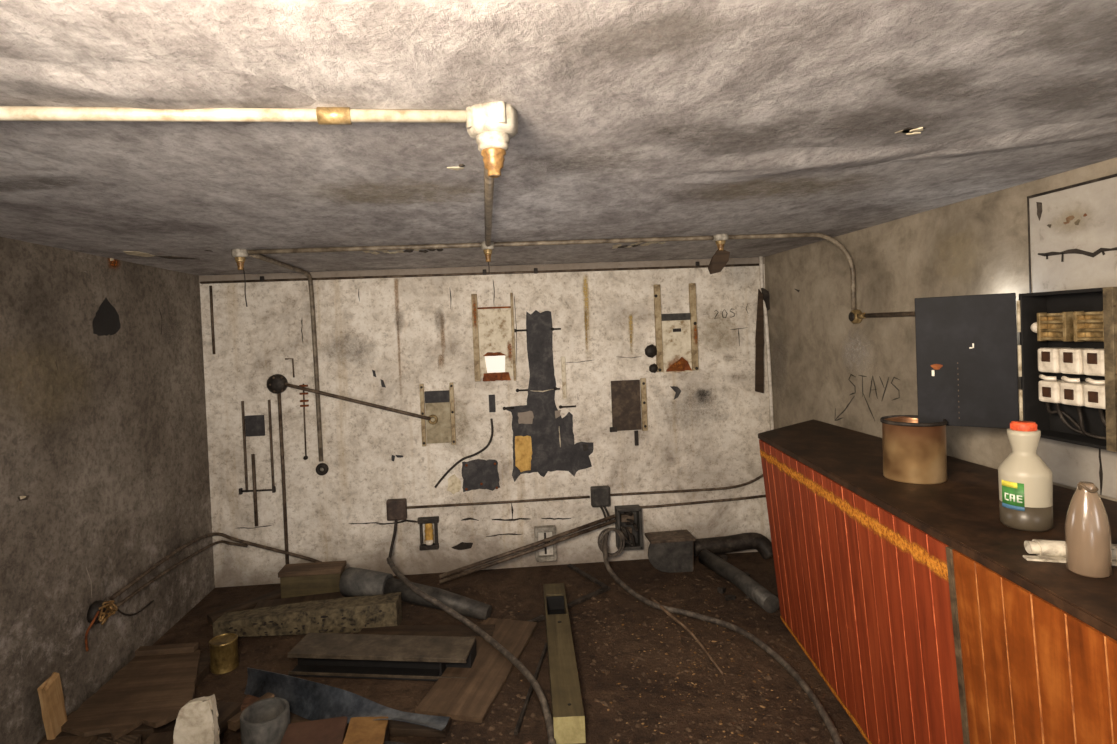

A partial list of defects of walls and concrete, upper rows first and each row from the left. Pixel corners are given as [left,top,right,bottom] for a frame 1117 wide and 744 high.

peeling [462,310,594,492]